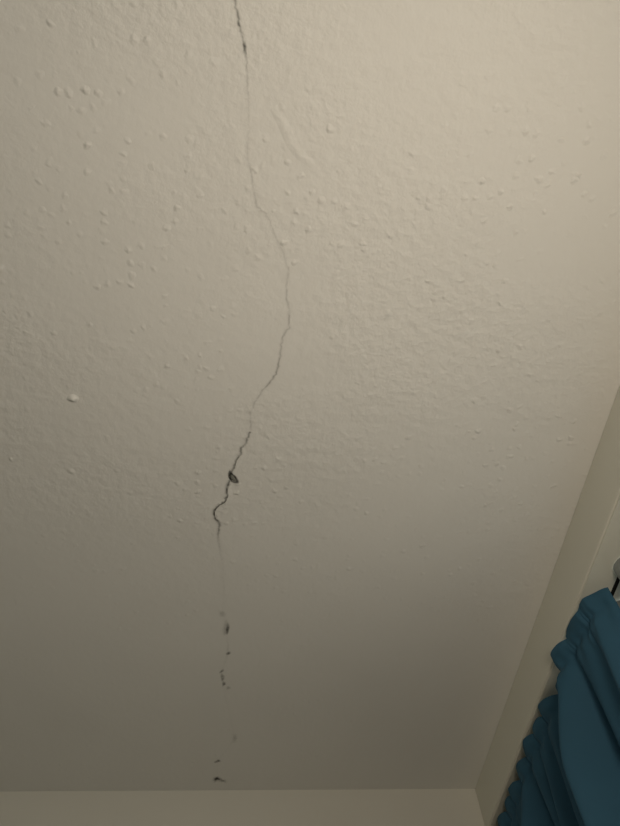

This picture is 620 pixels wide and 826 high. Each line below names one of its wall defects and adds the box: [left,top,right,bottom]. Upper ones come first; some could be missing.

crack [213,448,246,522]